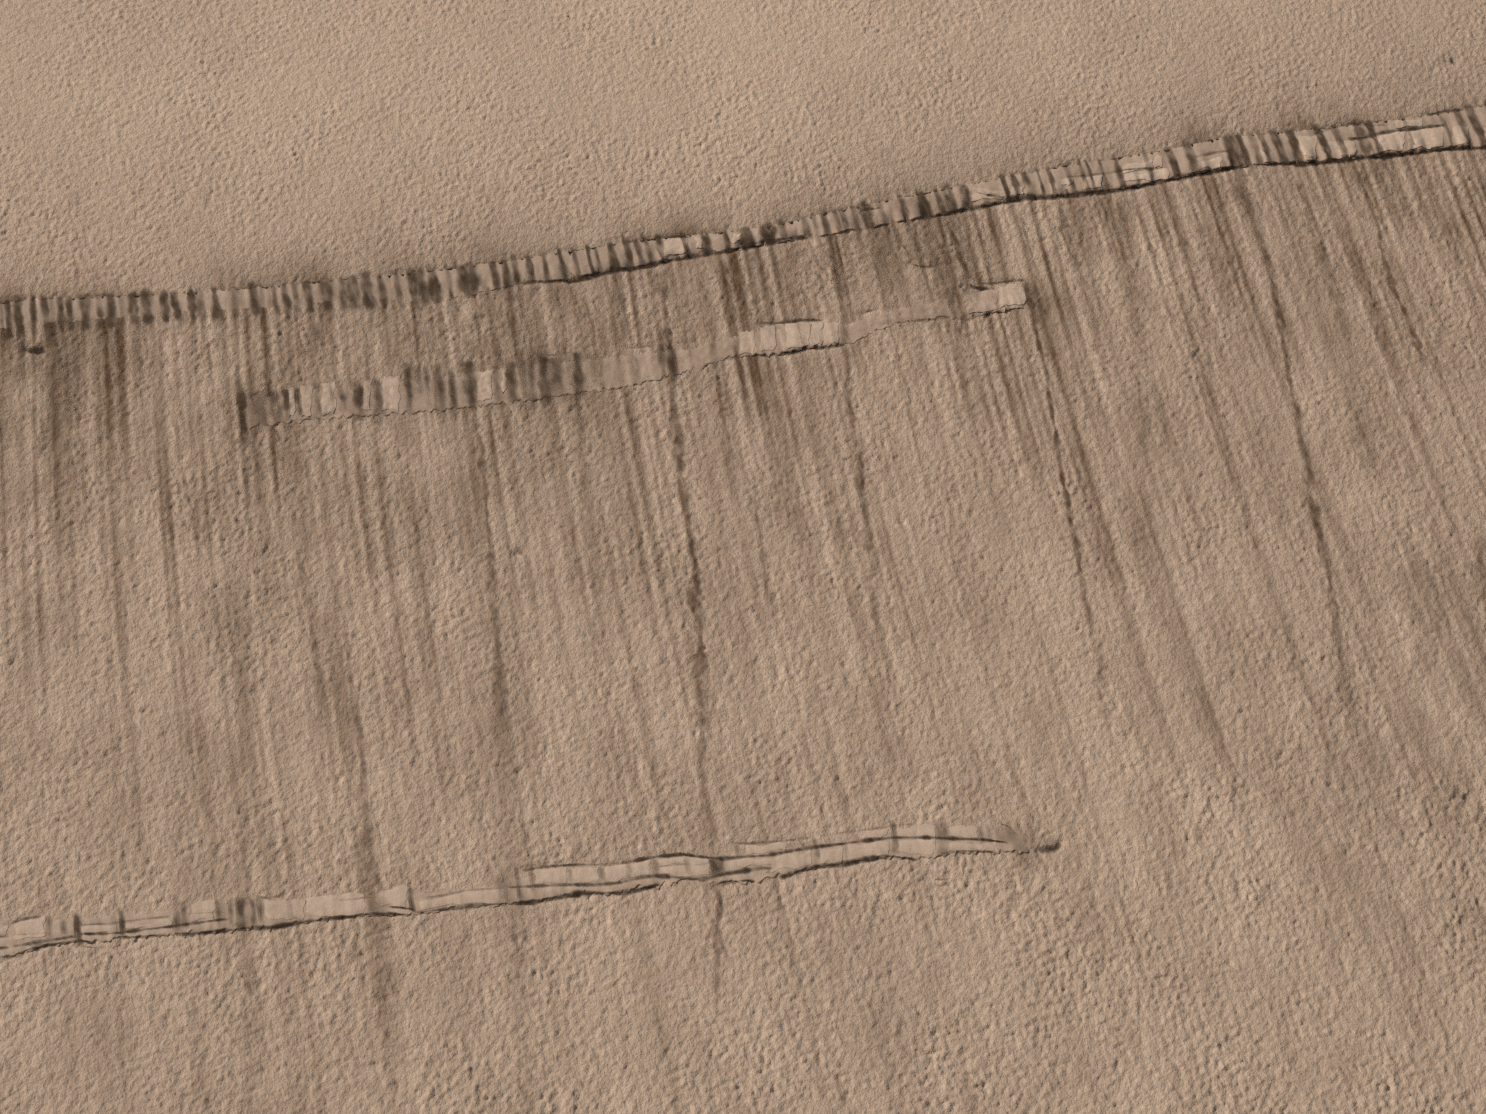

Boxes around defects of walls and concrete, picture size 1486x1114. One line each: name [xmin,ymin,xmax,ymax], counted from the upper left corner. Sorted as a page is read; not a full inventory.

crack [931,109,1485,217]
water stain [1313,121,1383,162]
water stain [1455,101,1486,147]
water stain [900,187,971,220]
water stain [248,235,664,315]
crack [523,235,804,283]
water stain [681,222,783,255]
crack [865,279,1021,323]
crack [769,318,841,355]
water stain [404,361,474,405]
water stain [674,433,703,656]
crack [0,835,1005,958]